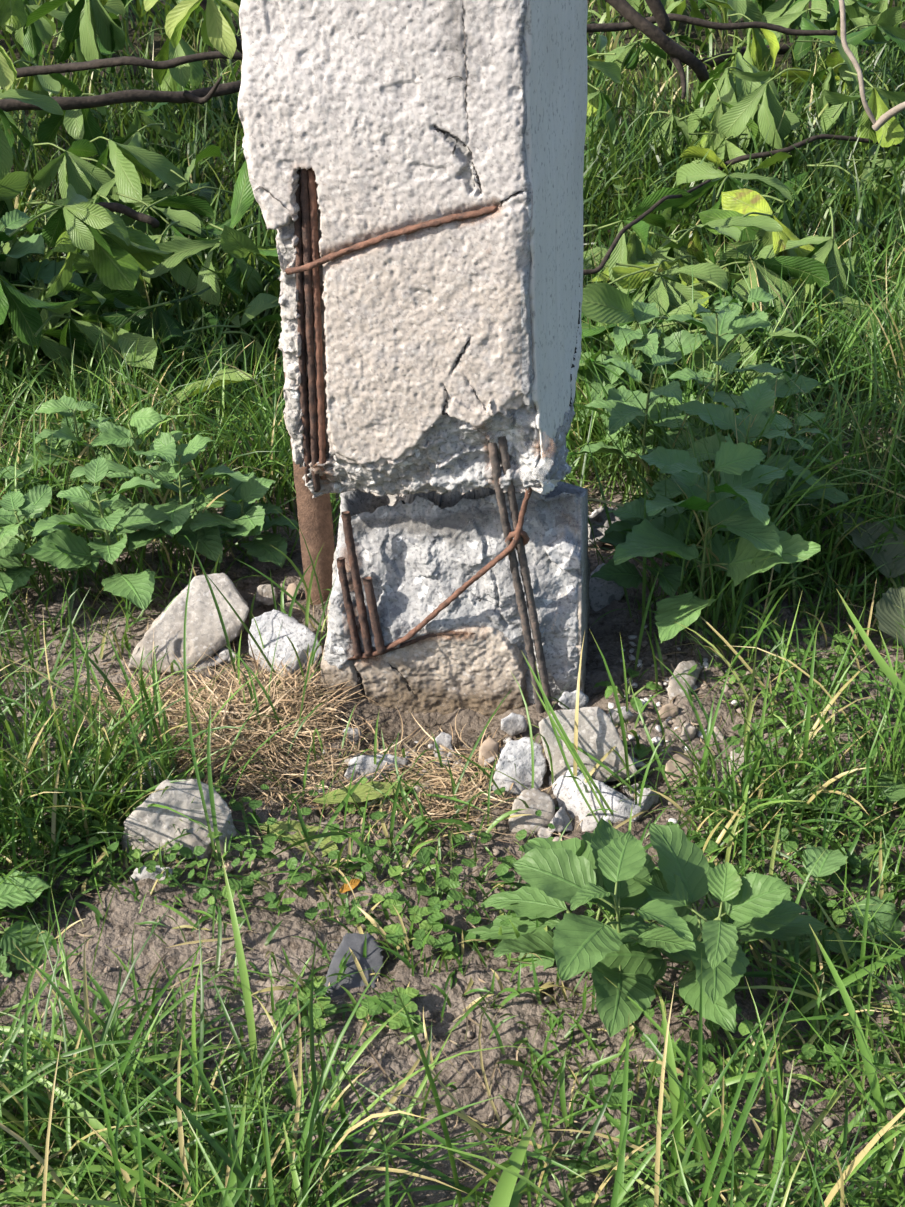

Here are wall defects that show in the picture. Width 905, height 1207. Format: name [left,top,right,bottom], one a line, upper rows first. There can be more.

crack [434,0,531,207]
spalling [276,0,581,714]
crack [442,336,493,416]